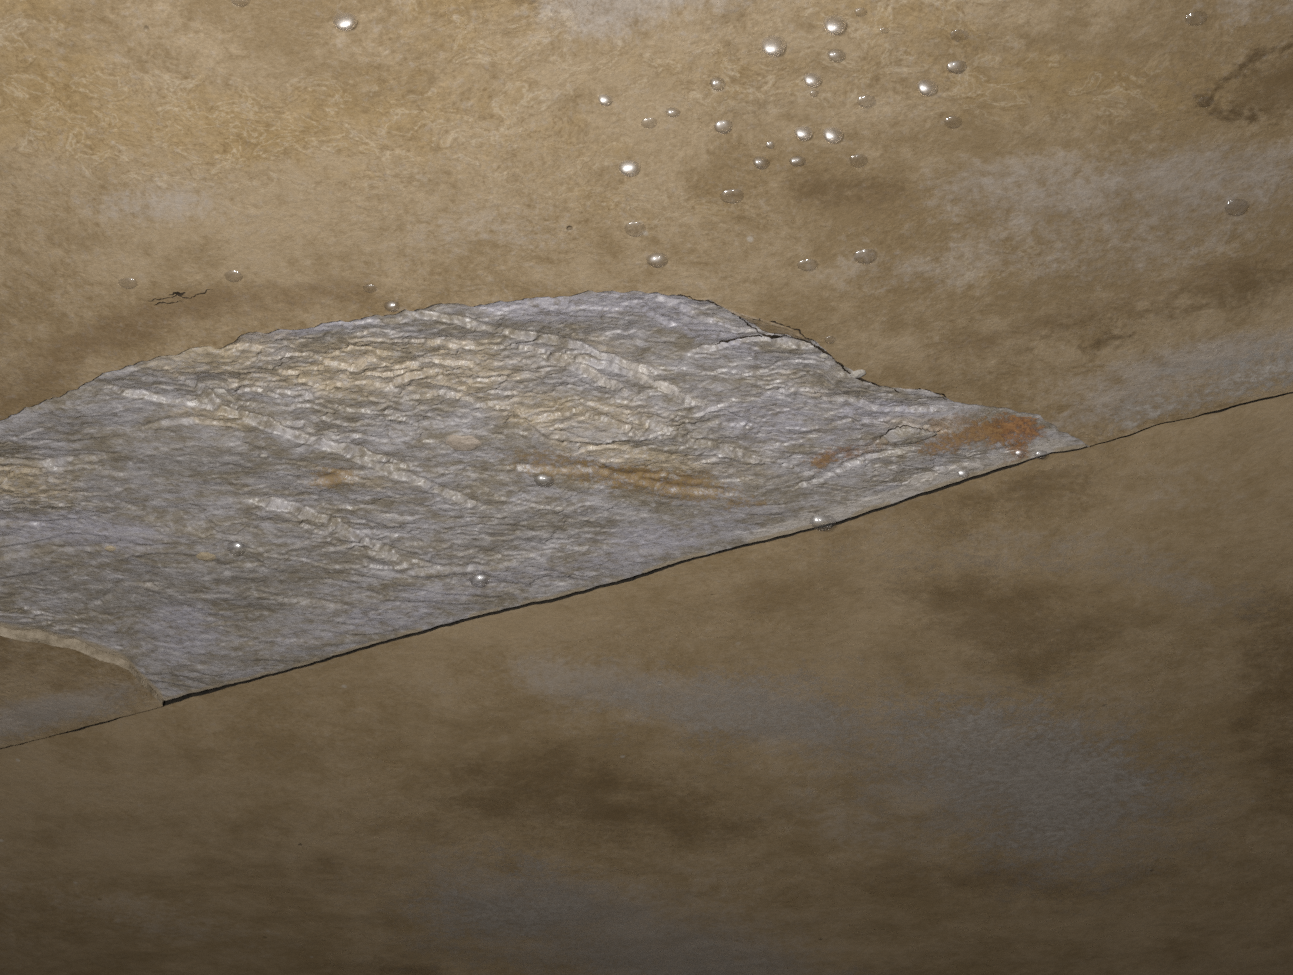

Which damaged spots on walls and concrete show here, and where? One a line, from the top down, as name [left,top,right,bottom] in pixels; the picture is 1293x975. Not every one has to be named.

spalling [0,290,1089,705]
rust [917,415,1045,455]